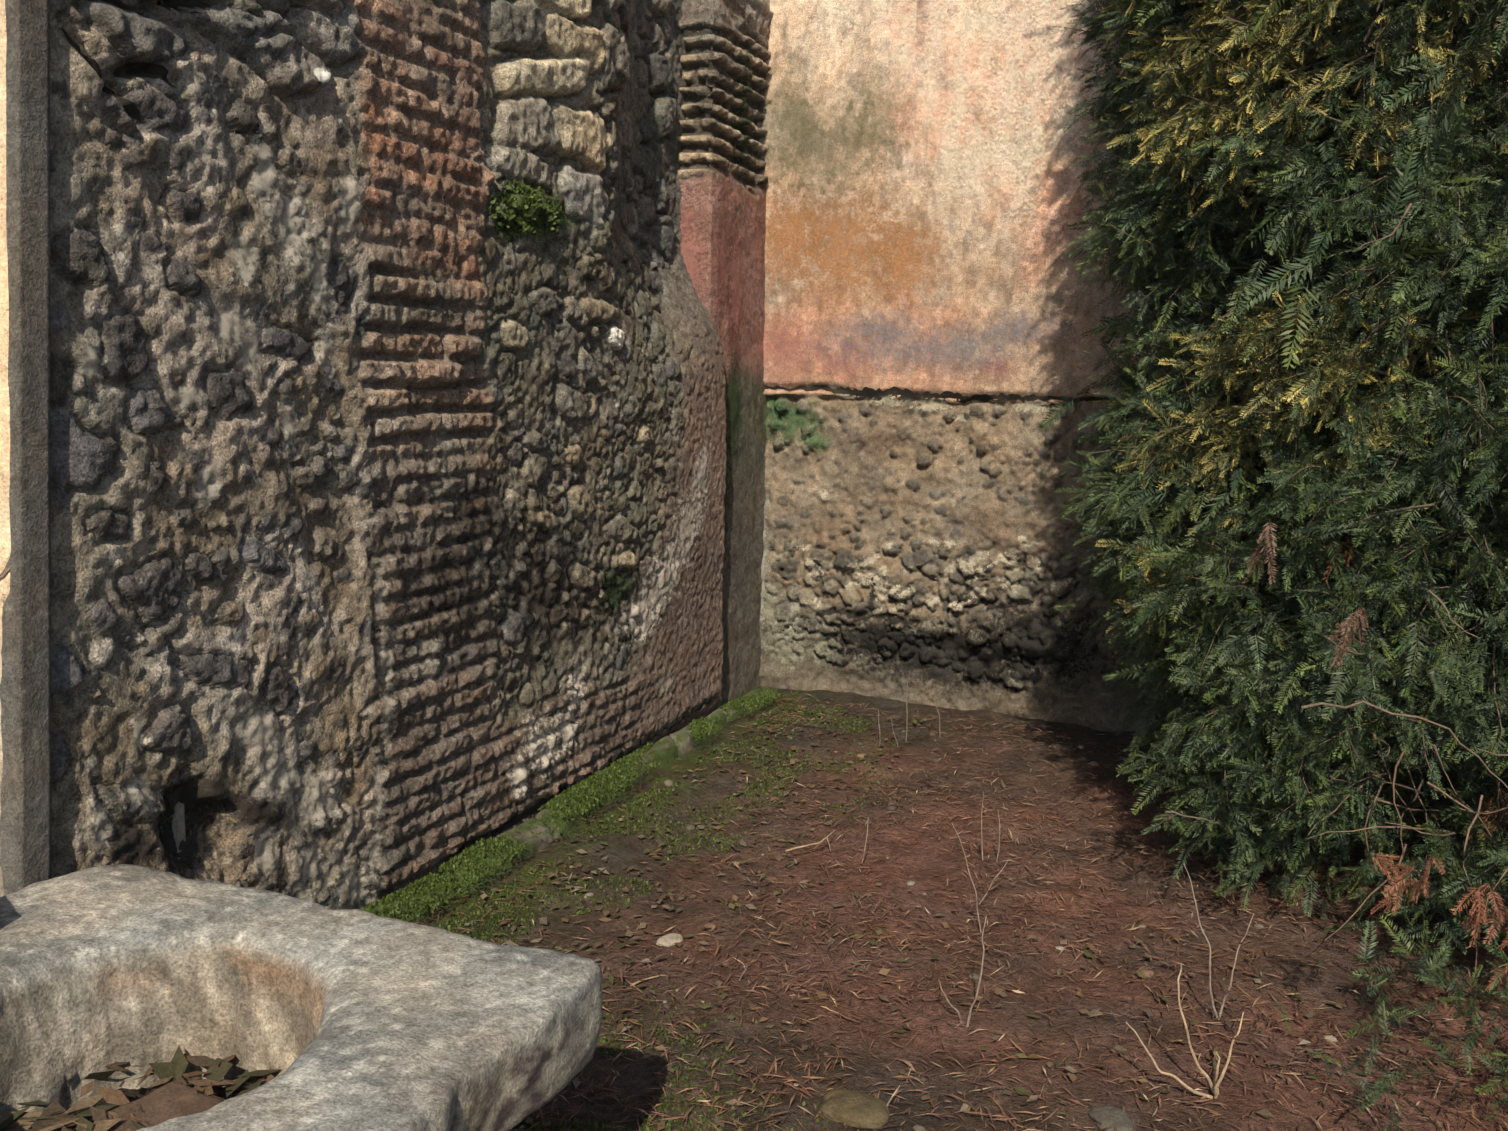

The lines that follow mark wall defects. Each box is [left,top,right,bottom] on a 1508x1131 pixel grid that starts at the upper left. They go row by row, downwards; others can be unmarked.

peeling [828,381,971,422]
crack [765,385,1110,406]
peeling [995,401,1056,415]
water stain [506,649,589,799]